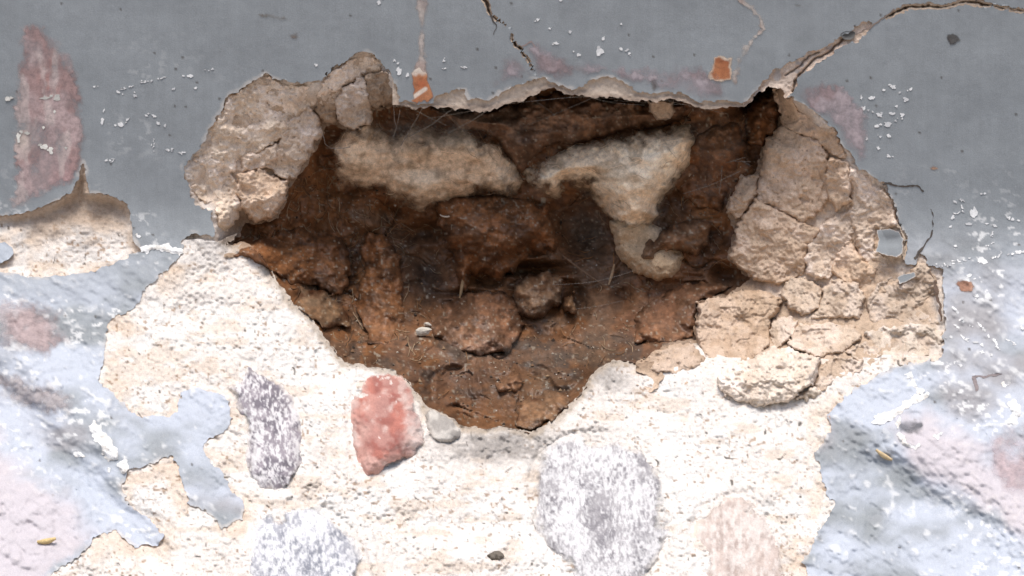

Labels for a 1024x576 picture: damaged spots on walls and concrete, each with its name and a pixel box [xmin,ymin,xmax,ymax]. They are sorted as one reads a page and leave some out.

leakage [5,26,83,204]
corrosion [411,67,433,103]
crack [481,0,537,83]
corrosion [708,56,732,82]
crack [743,0,1024,105]
flaking render [0,164,141,278]
flaking render [51,60,955,576]
peeling [952,306,1000,356]